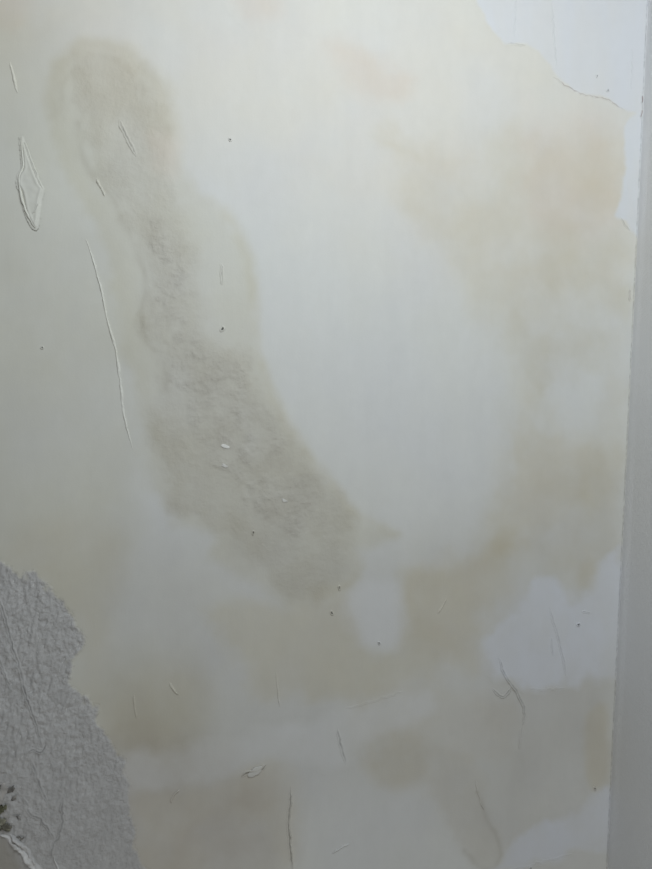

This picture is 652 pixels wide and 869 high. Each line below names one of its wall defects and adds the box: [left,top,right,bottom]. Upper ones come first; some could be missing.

peeling [475,0,646,238]
leakage [0,0,407,753]
leakage [193,107,635,869]
spalling [0,782,42,869]
leakage [130,764,309,869]